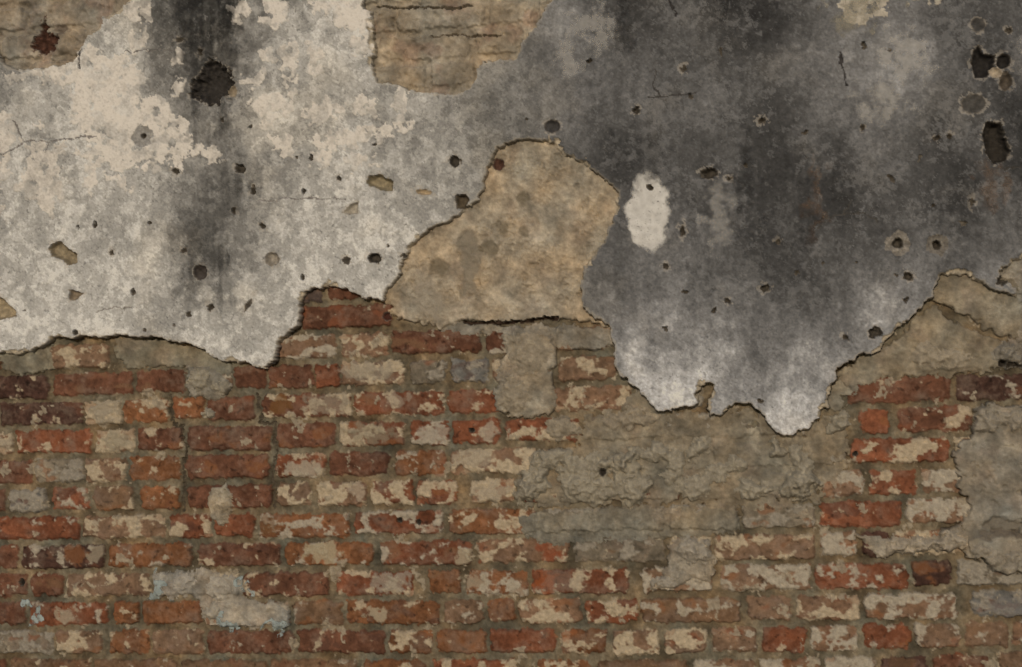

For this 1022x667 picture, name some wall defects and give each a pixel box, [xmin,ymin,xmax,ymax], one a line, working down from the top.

peeling [836,0,890,26]
peeling [0,0,229,220]
spalling [225,0,552,192]
peeling [987,67,1013,92]
crack [0,120,97,156]
spalling [384,119,619,331]
efflorescence [624,171,670,252]
peeling [0,296,17,320]
peeling [68,289,84,301]